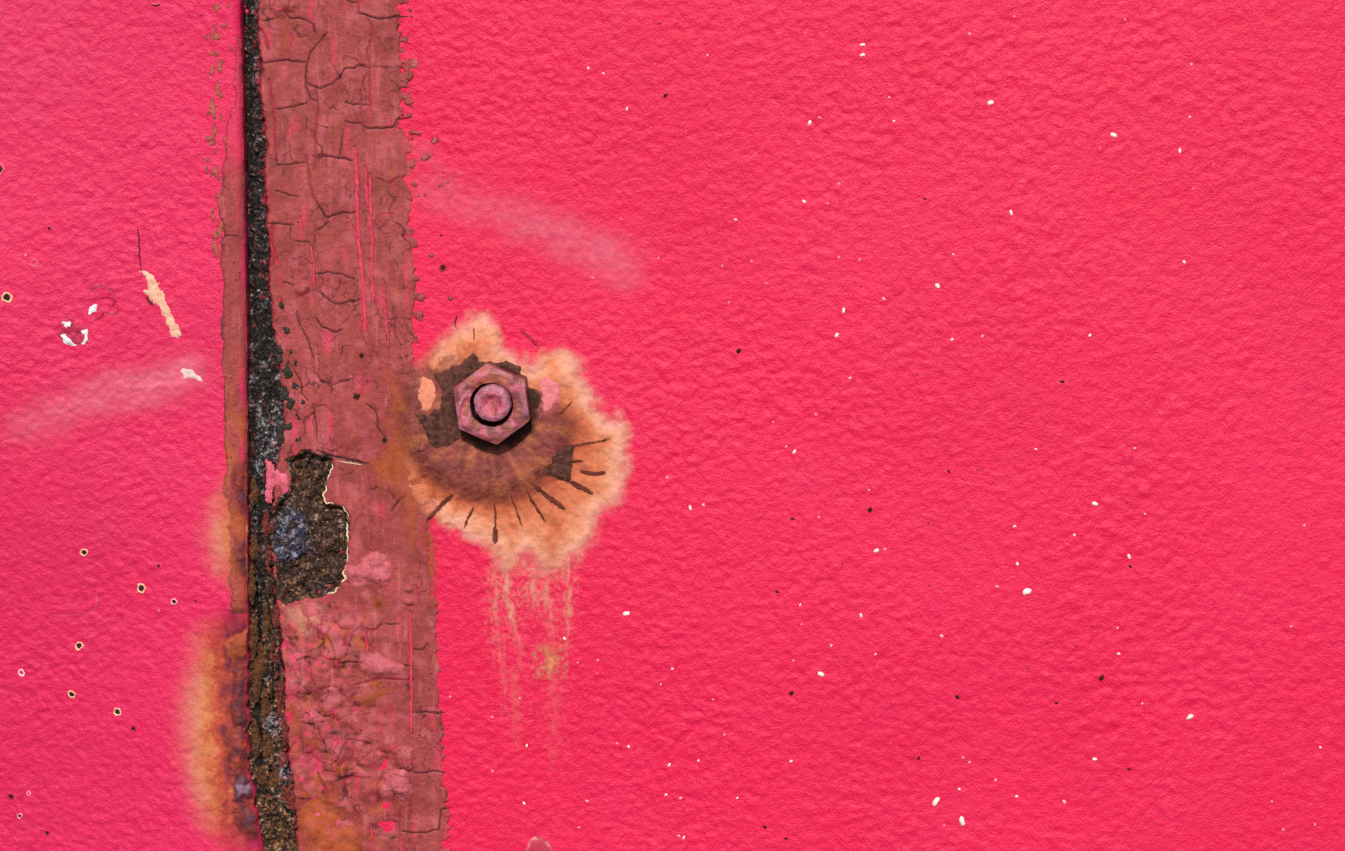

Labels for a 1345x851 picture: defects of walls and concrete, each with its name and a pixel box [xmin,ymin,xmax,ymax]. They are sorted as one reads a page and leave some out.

peeling [181,368,203,382]
rust [215,461,247,576]
peeling [205,0,452,851]
rust [364,313,632,622]
rust [191,618,259,840]
rust [534,647,561,676]